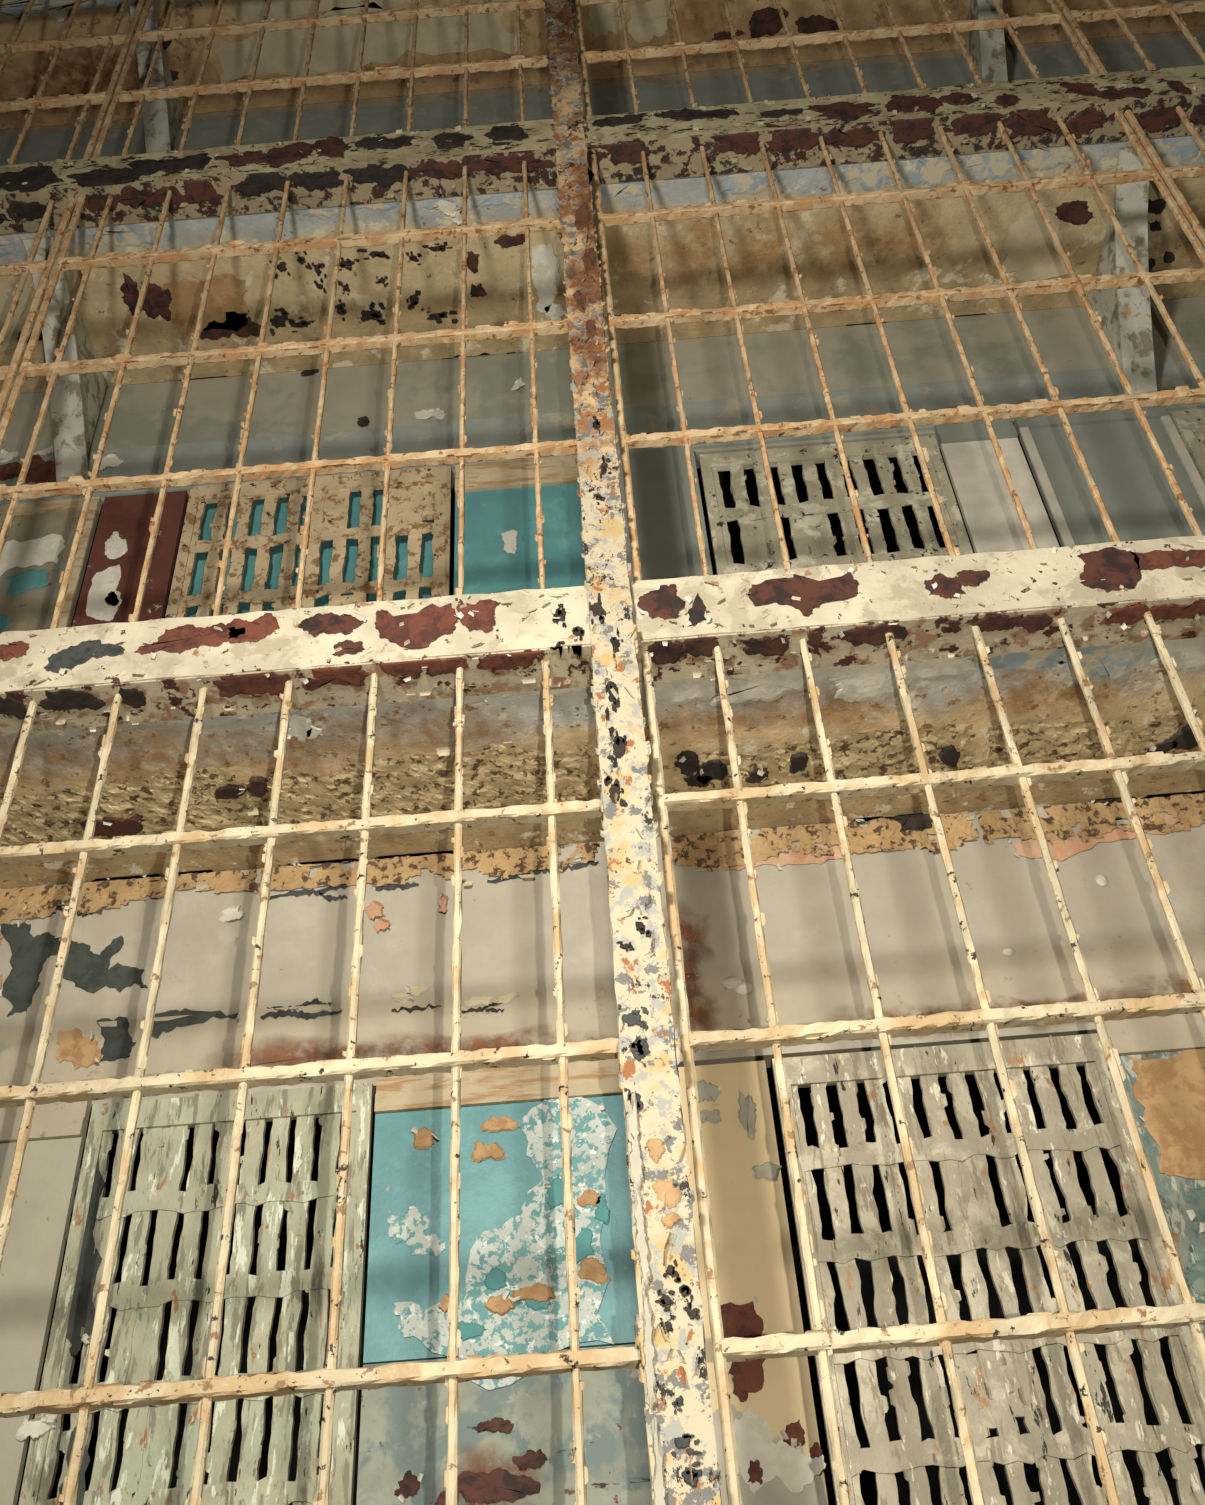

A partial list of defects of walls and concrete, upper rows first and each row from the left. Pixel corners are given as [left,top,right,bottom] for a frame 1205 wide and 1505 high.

peeling [574,80,1205,232]
peeling [120,273,315,340]
peeling [269,242,487,325]
peeling [86,531,128,621]
peeling [0,613,280,739]
peeling [195,593,623,743]
spalling [0,681,628,846]
peeling [0,841,599,1017]
peeling [618,1004,651,1061]
peeling [1131,1048,1205,1233]
peeling [64,1137,105,1356]
peeling [387,1080,827,1505]